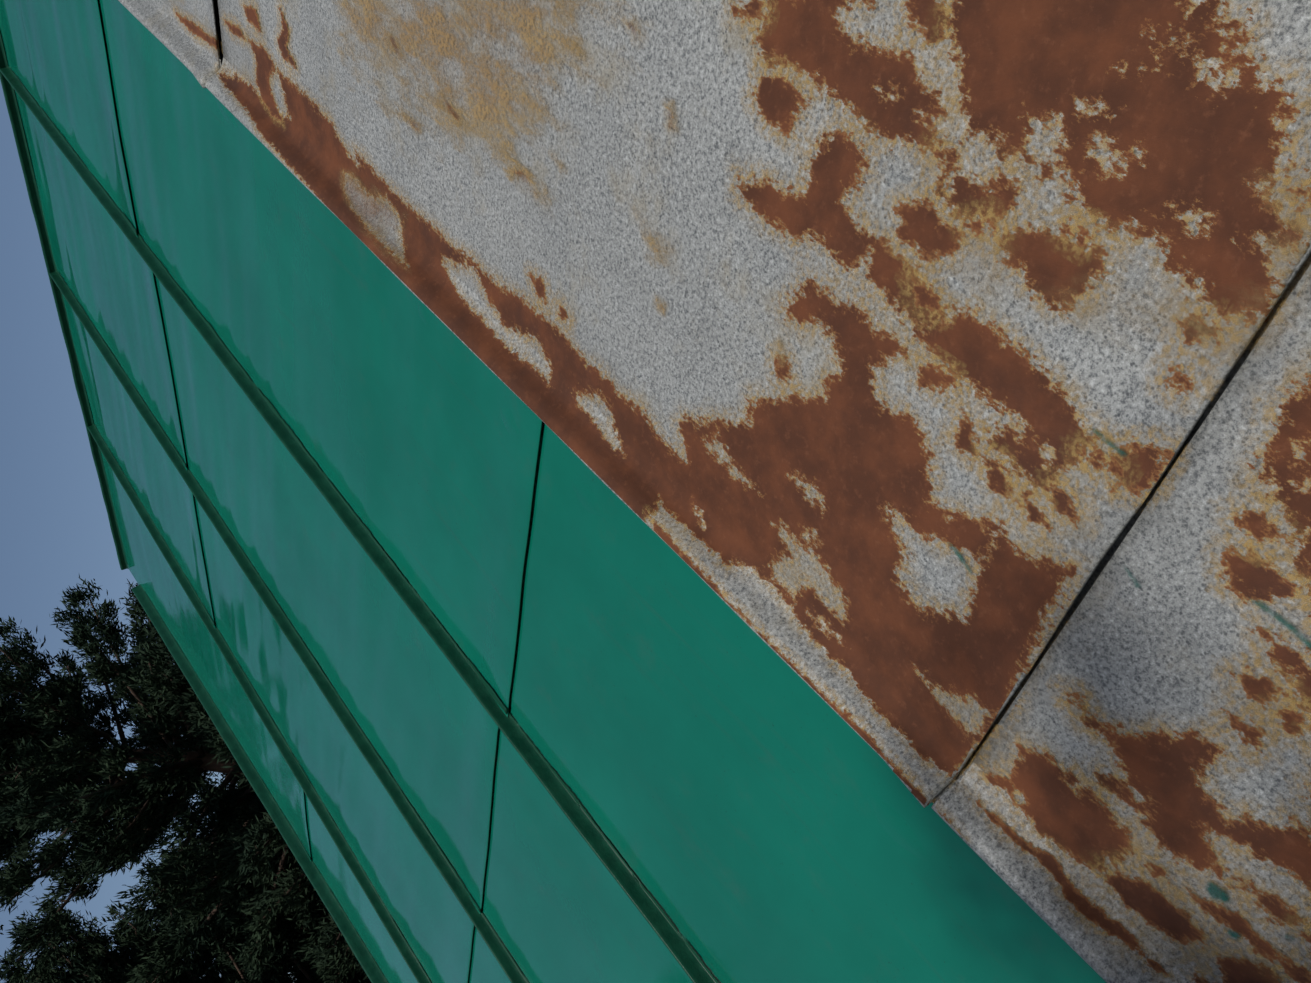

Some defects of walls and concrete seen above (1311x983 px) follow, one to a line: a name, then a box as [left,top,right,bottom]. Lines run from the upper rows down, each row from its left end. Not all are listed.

rust [175,11,219,50]
rust [218,0,1311,835]
rust [976,626,1311,983]